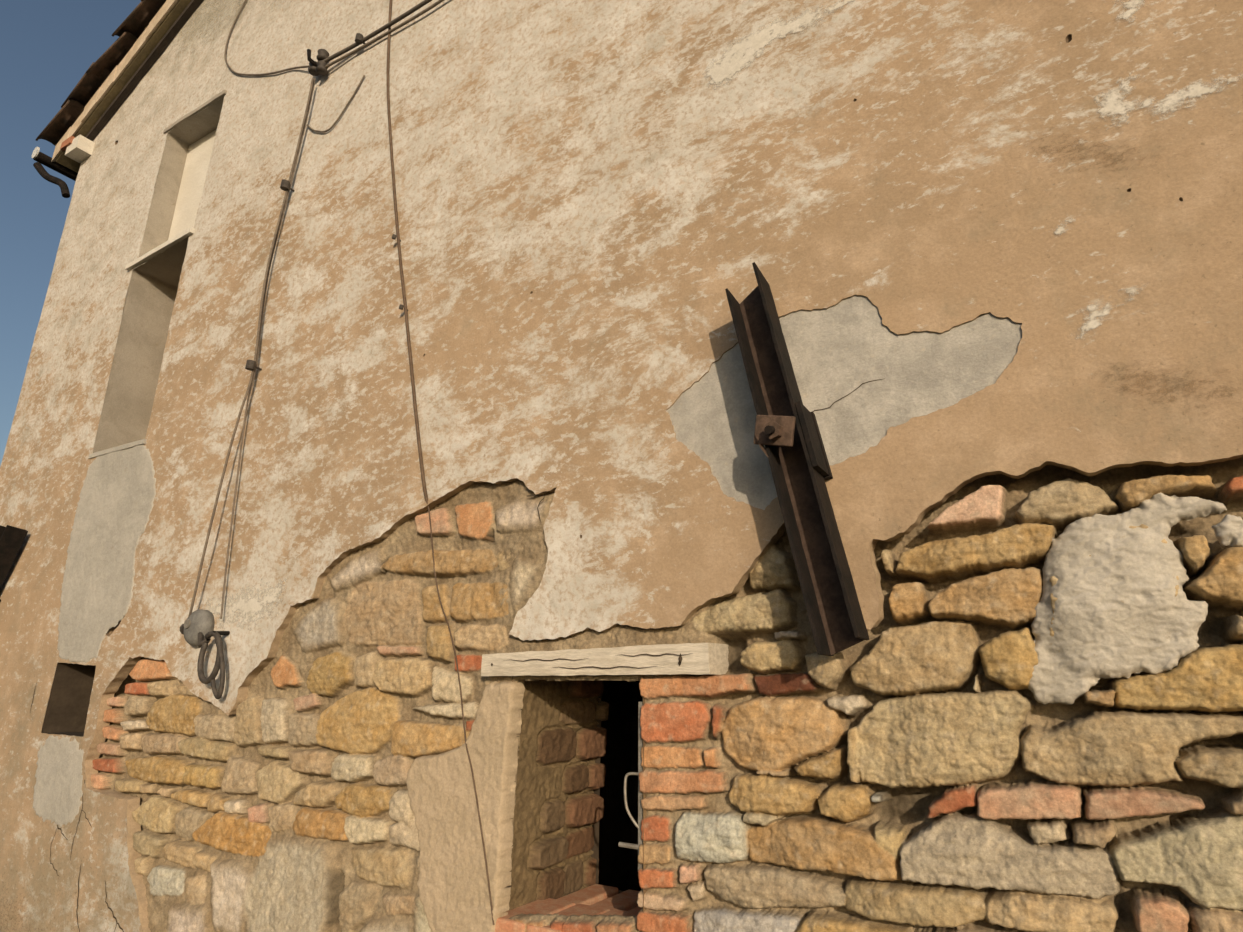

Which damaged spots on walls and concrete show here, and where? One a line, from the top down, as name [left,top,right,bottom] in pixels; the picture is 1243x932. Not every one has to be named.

peeling [666,342,777,510]
peeling [779,294,1022,466]
spalling [84,454,1243,932]
crack [50,780,124,932]